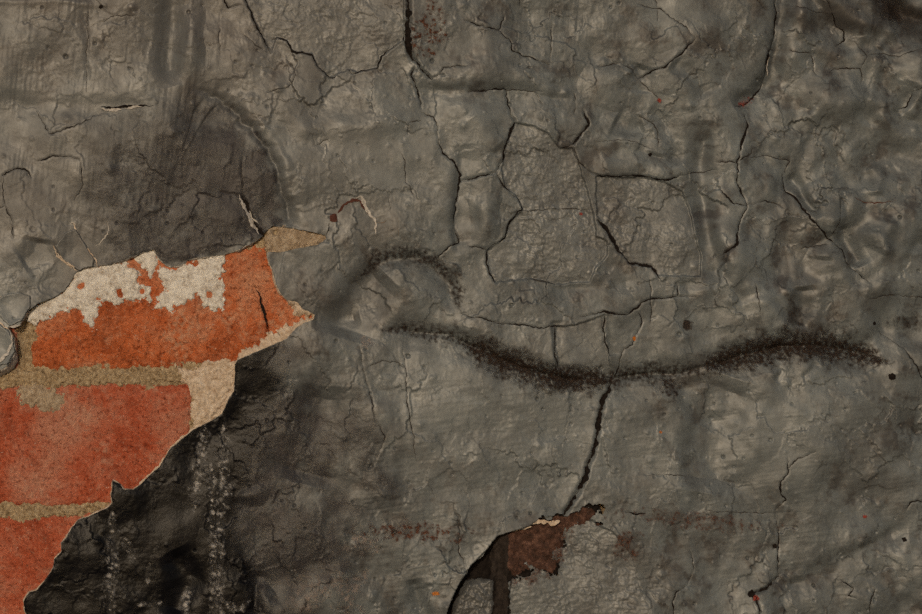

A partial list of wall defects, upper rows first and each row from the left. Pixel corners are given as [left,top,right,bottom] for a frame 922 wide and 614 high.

crack [85,9,132,91]
crack [0,111,93,236]
crack [562,0,922,299]
crack [218,0,696,516]
peeling [0,195,377,614]
damp [466,337,608,392]
damp [704,328,882,371]
peeling [447,503,651,614]
crack [672,553,694,614]
crack [708,451,816,614]